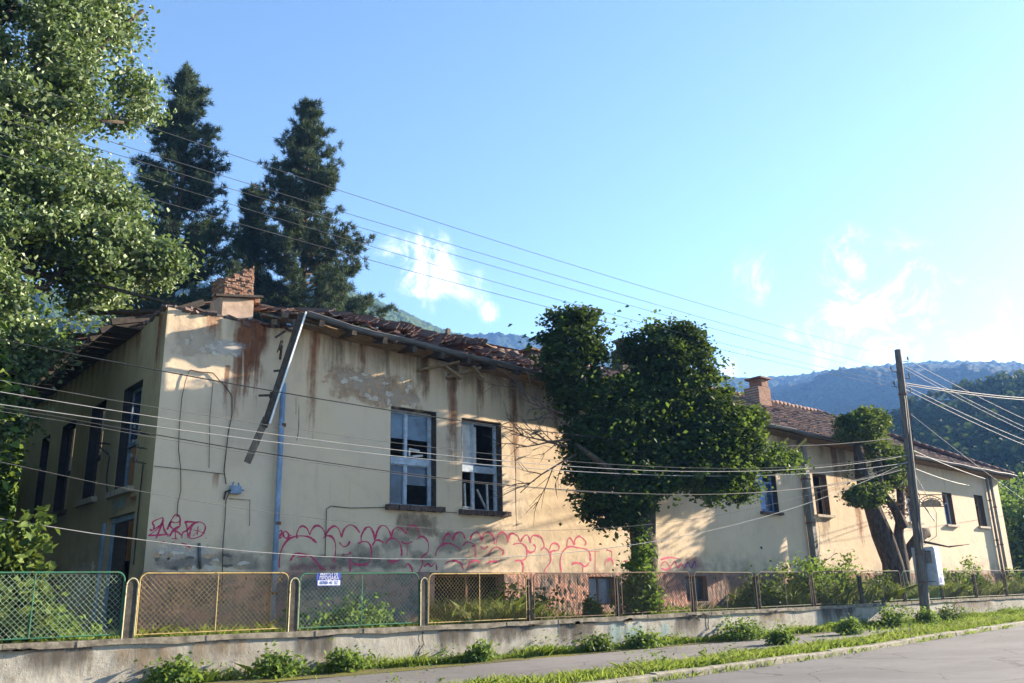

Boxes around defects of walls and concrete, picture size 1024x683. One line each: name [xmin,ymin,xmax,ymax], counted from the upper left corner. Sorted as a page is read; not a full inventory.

peeling [179,329,239,357]
rust [224,319,267,407]
peeling [321,368,417,406]